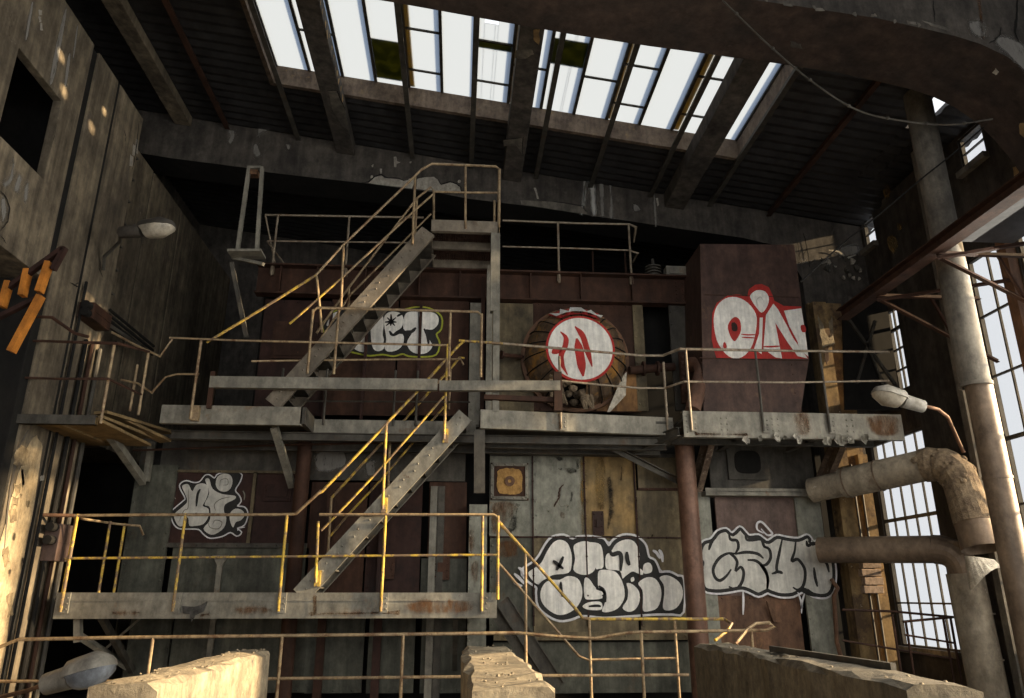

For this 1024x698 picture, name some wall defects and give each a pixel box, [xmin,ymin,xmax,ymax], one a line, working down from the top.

spalling [361,157,462,191]
rust [868,416,898,435]
flaking render [0,430,44,678]